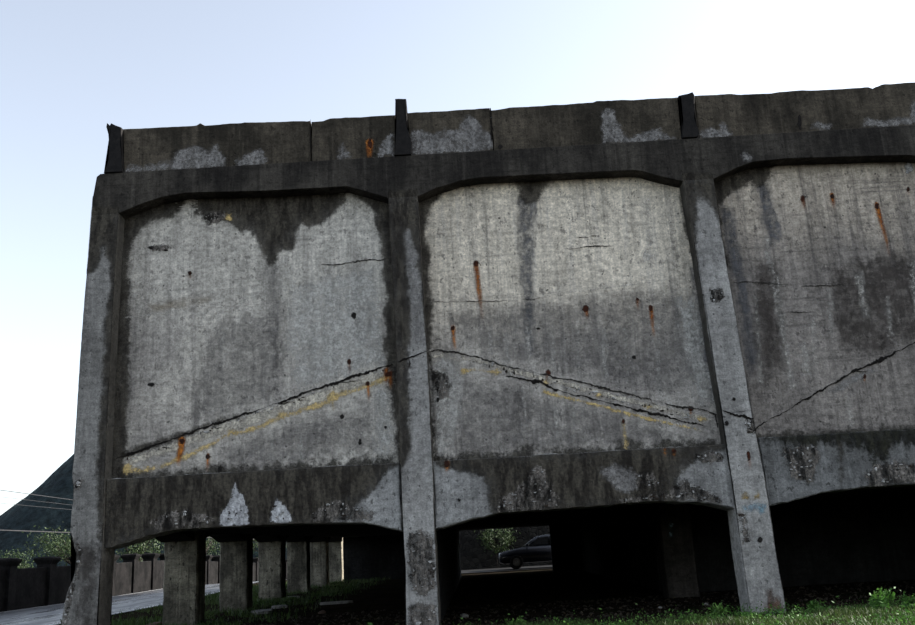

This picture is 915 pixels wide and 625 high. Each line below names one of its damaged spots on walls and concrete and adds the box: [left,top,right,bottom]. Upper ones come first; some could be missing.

damp [410,116,493,154]
damp [601,109,670,143]
rust [875,202,886,237]
damp [679,154,794,386]
damp [833,257,915,353]
damp [76,181,725,625]
crack [116,342,915,465]
rust [177,437,185,459]
peeling [150,483,249,530]
spalling [494,464,560,512]
spalling [407,529,437,625]